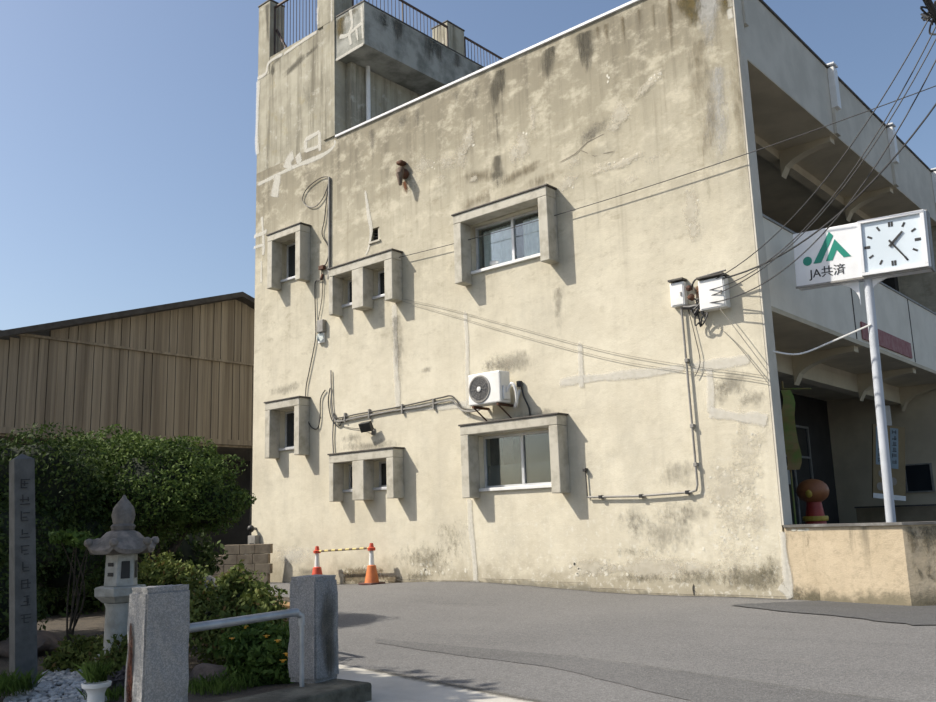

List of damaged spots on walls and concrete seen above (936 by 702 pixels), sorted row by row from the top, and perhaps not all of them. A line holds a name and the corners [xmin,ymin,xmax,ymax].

water stain [668,0,727,28]
water stain [545,47,553,73]
water stain [578,31,591,65]
water stain [491,70,504,103]
water stain [493,156,502,181]